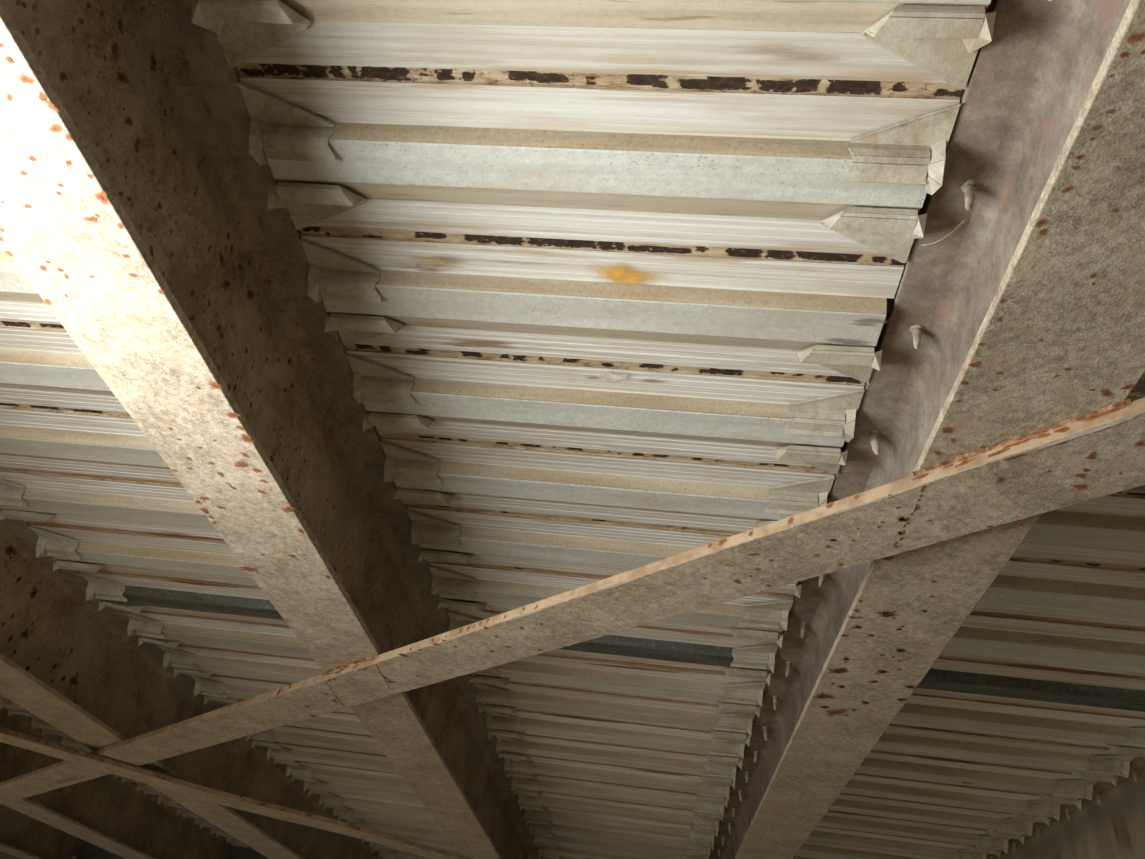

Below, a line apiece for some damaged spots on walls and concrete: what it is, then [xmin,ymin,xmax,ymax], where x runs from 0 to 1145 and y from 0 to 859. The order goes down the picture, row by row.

corrosion [19,76,72,141]
corrosion [84,175,131,222]
corrosion [599,267,651,283]
corrosion [453,340,506,348]
corrosion [227,412,306,494]
corrosion [877,384,1133,560]
corrosion [813,658,869,716]